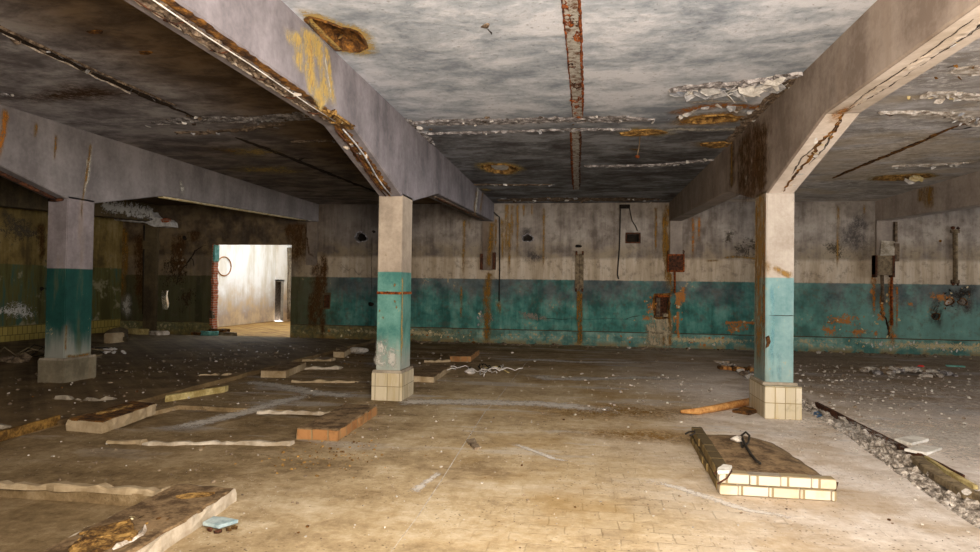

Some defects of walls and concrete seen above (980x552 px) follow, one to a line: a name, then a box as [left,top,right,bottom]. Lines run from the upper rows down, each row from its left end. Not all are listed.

rust [0,111,9,152]
crack [0,25,198,120]
spalling [134,0,392,197]
water stain [287,30,356,130]
rust [561,0,584,190]
peeling [666,76,790,139]
crack [783,20,980,192]
water stain [0,301,33,318]
rust [483,220,501,340]
flaking render [620,287,754,347]
water stain [700,126,767,362]
peeling [822,294,980,352]